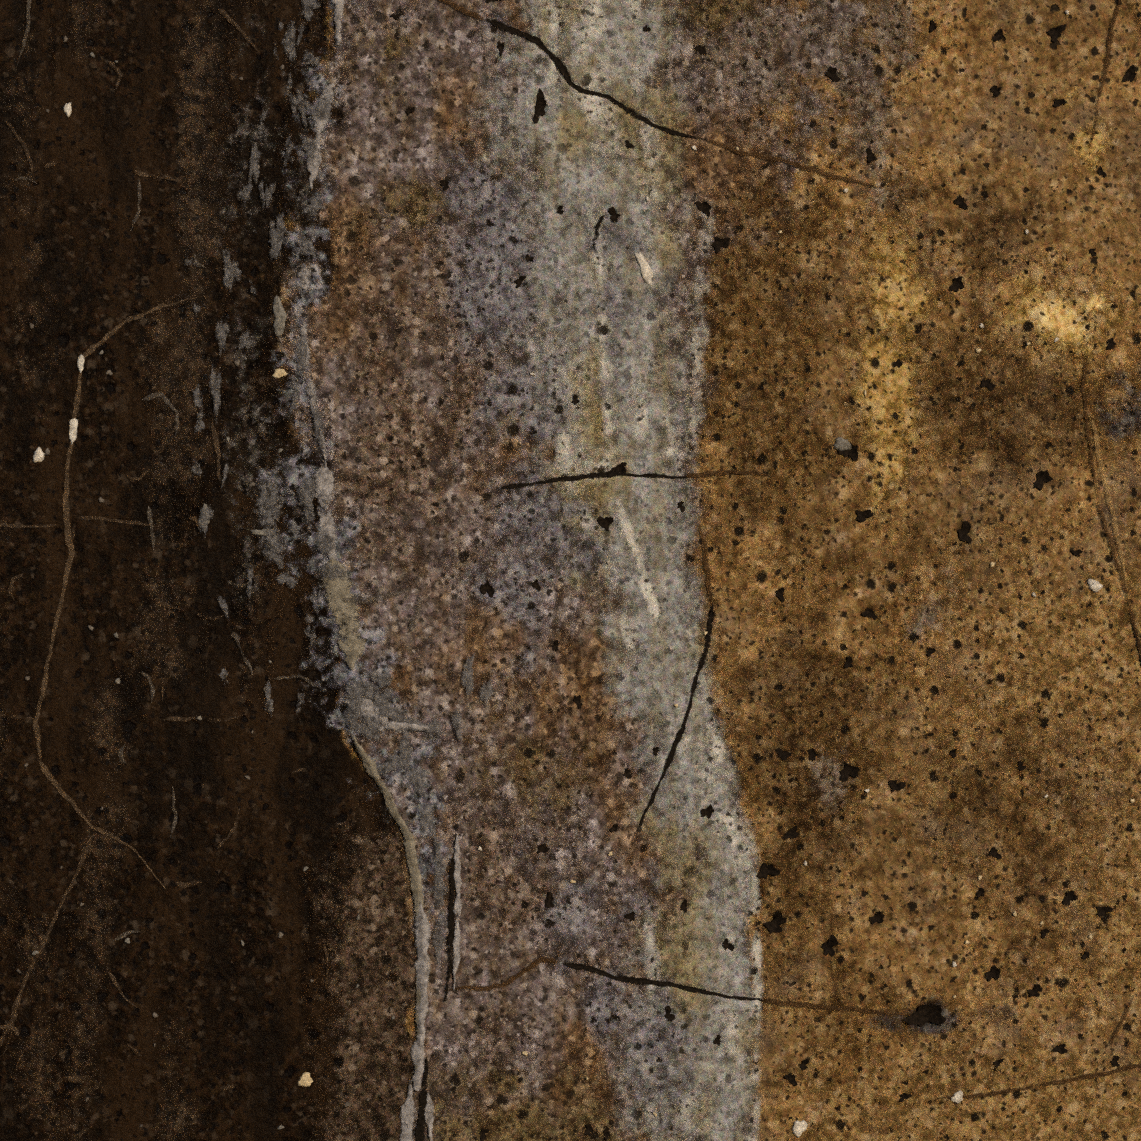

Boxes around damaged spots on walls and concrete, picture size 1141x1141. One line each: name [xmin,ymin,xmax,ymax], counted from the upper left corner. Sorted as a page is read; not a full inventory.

crack [439,0,884,188]
water stain [0,0,886,1141]
crack [501,470,773,489]
water stain [864,302,1141,474]
crack [639,524,714,826]
water stain [930,736,1081,876]
crack [444,826,911,1015]